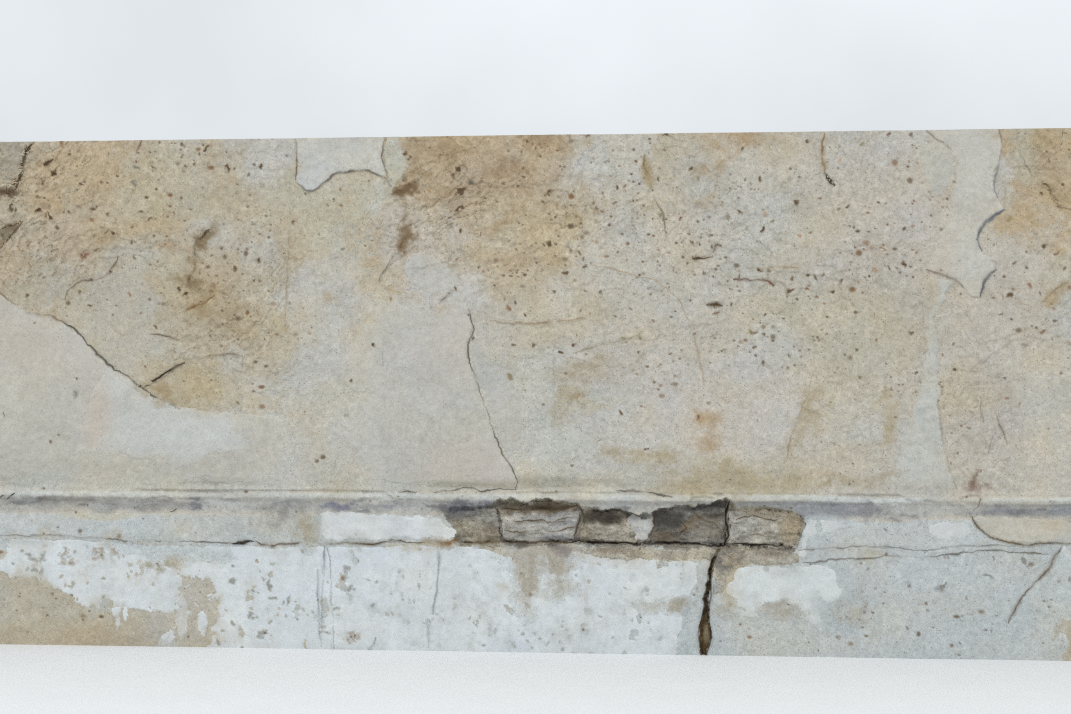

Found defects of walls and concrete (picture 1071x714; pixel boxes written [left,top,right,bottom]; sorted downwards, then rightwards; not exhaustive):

spalling [34,207,60,231]
spalling [79,212,115,262]
spalling [179,141,213,166]
spalling [224,162,264,177]
flaking render [285,137,413,188]
spalling [447,165,478,235]
flaking render [892,129,1015,490]
crack [398,288,639,494]
peeling [0,250,851,655]
crack [0,533,458,551]
crack [800,399,1071,624]
crack [696,545,743,655]